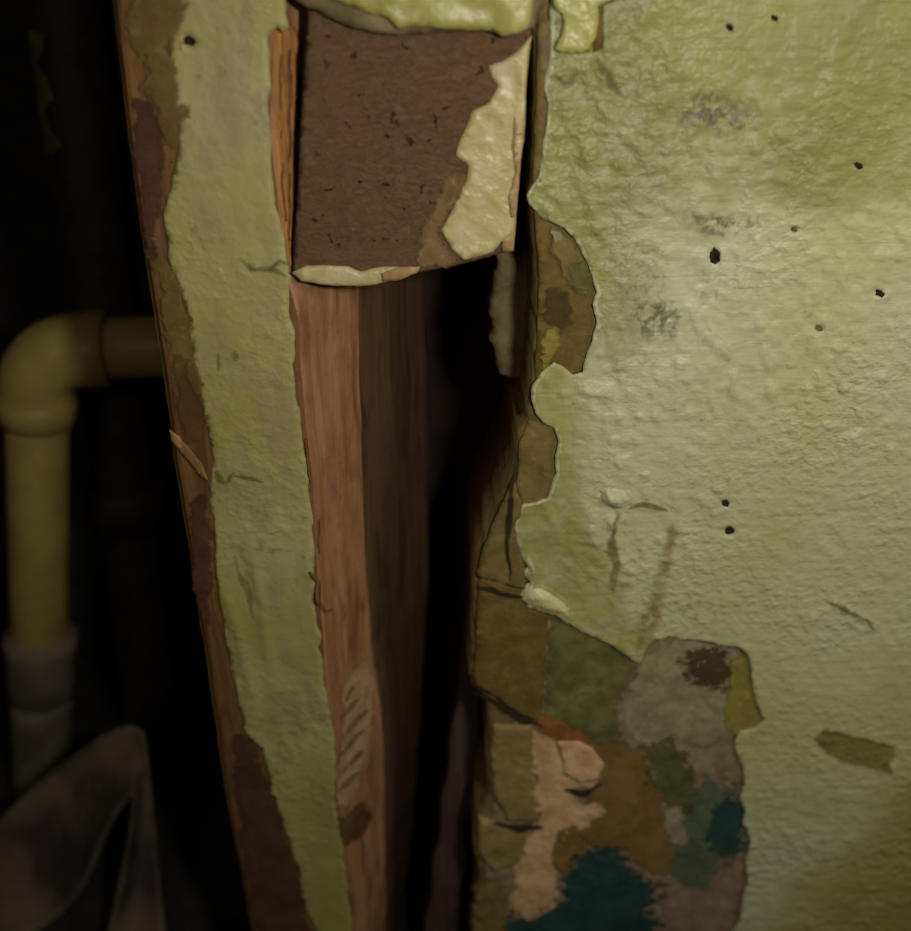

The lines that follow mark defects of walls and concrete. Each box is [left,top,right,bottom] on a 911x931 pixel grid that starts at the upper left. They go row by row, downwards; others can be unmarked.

peeling [127,0,210,481]
peeling [296,0,616,380]
peeling [189,494,214,624]
peeling [471,419,762,931]
peeling [818,729,895,772]